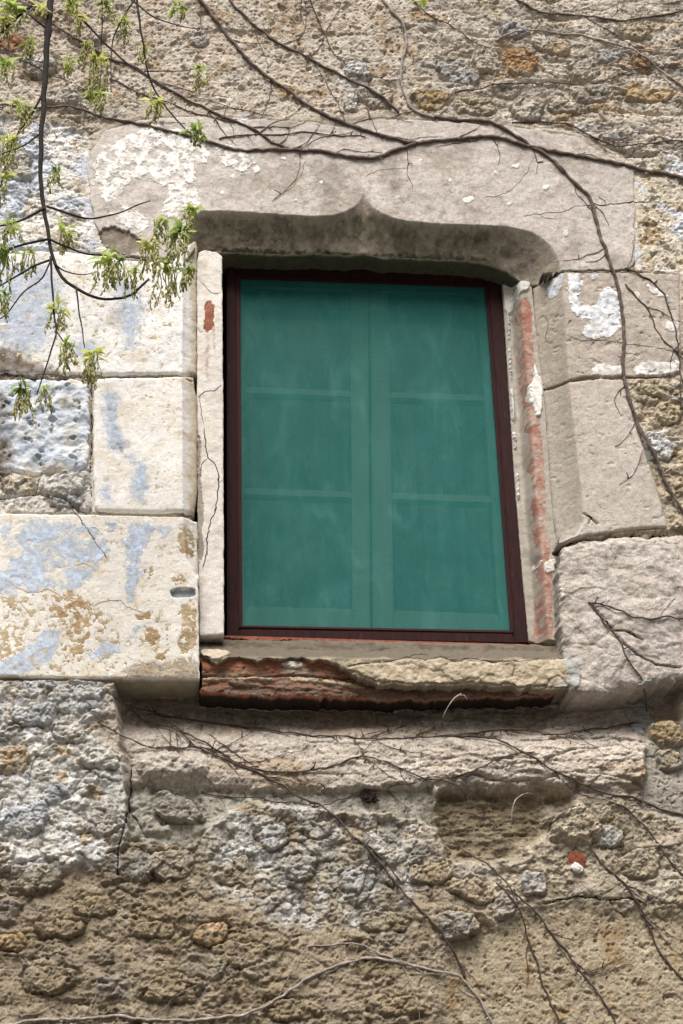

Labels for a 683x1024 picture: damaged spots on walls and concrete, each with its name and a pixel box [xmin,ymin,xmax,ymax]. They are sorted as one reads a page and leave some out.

peeling [0,127,256,369]
peeling [545,273,622,340]
crack [0,375,158,558]
crack [183,377,221,566]
spalling [503,281,566,643]
spalling [281,658,569,689]
crack [107,766,143,875]